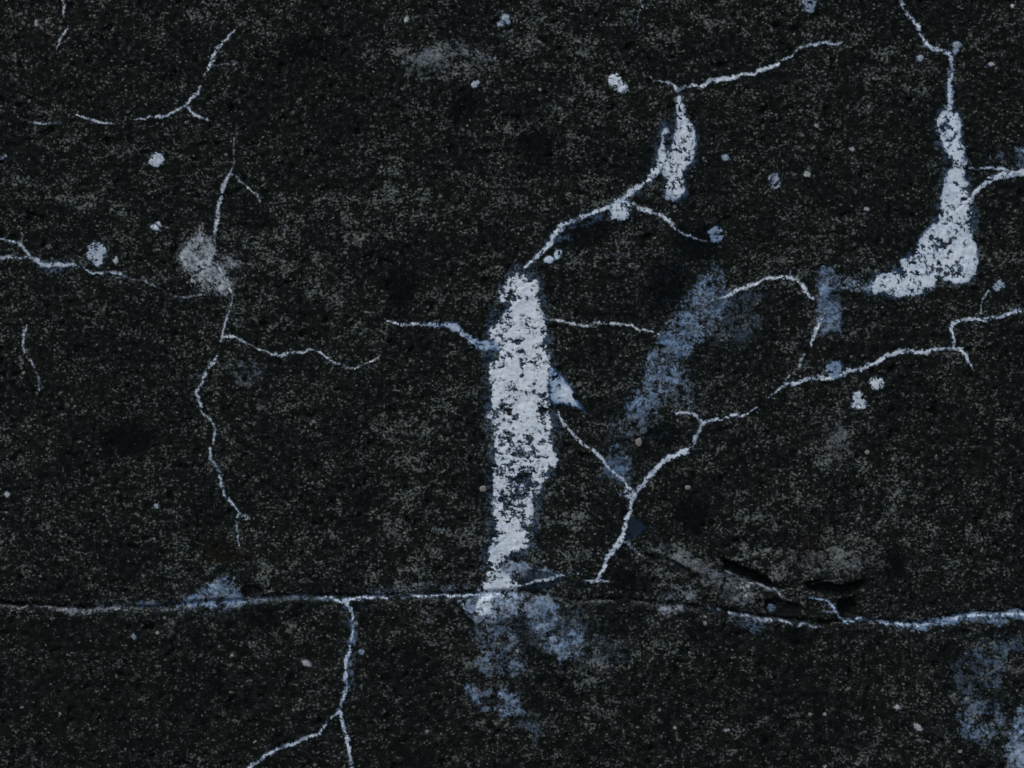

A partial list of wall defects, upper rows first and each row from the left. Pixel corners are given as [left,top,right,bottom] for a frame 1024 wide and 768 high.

crack [76,29,235,124]
crack [0,238,155,287]
crack [22,325,40,390]
crack [194,173,379,546]
crack [247,1,1024,768]
damp [458,273,583,660]
damp [466,685,520,716]